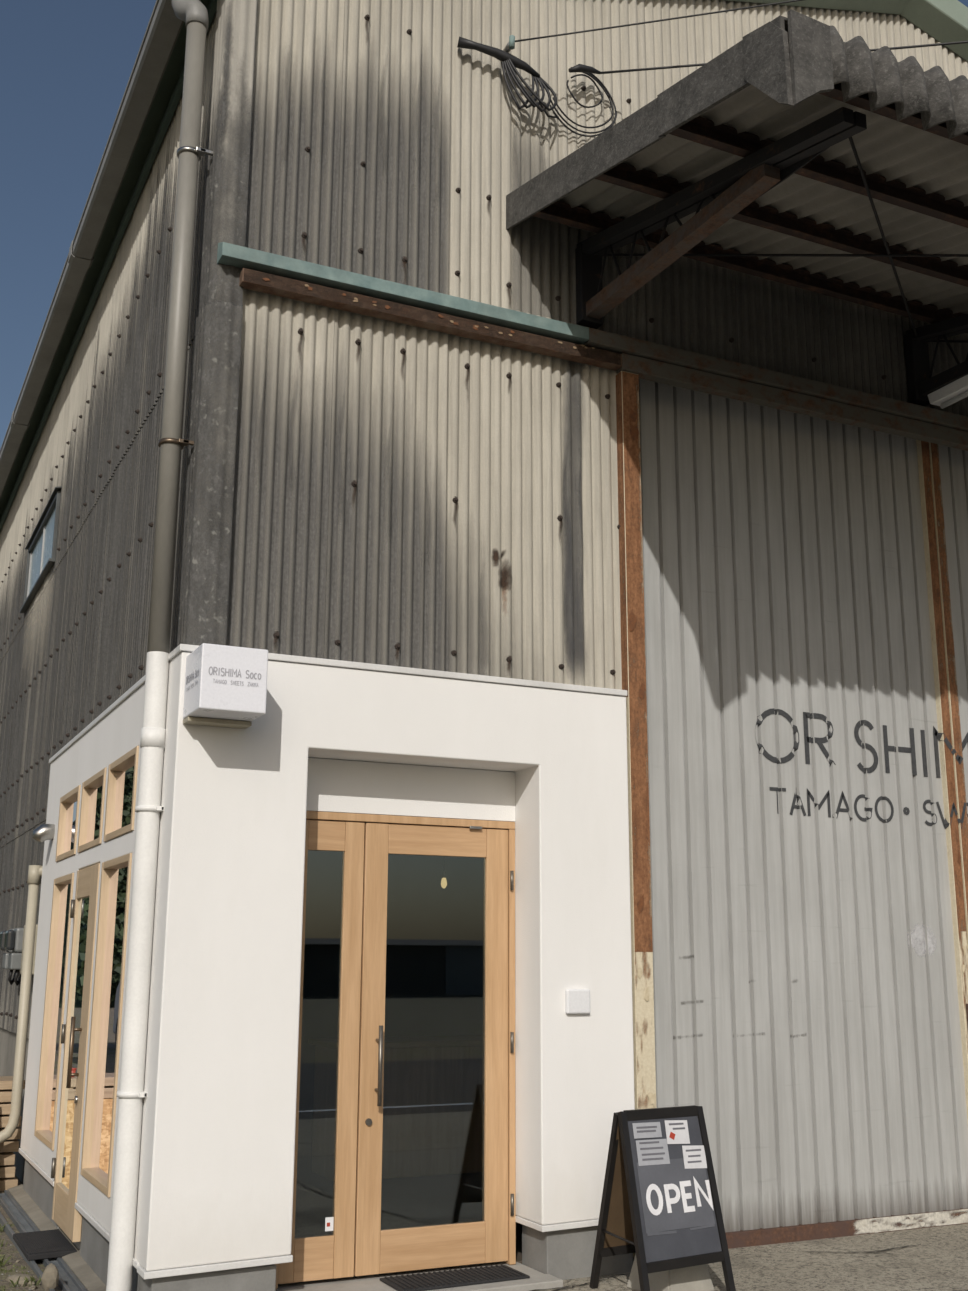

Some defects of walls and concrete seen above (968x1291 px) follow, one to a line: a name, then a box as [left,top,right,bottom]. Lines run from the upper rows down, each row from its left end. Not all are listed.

water stain [169,19,484,675]
water stain [0,180,175,933]
water stain [563,361,584,668]
water stain [0,950,34,1037]
peeling [958,931,968,1005]
peeling [855,1209,968,1234]